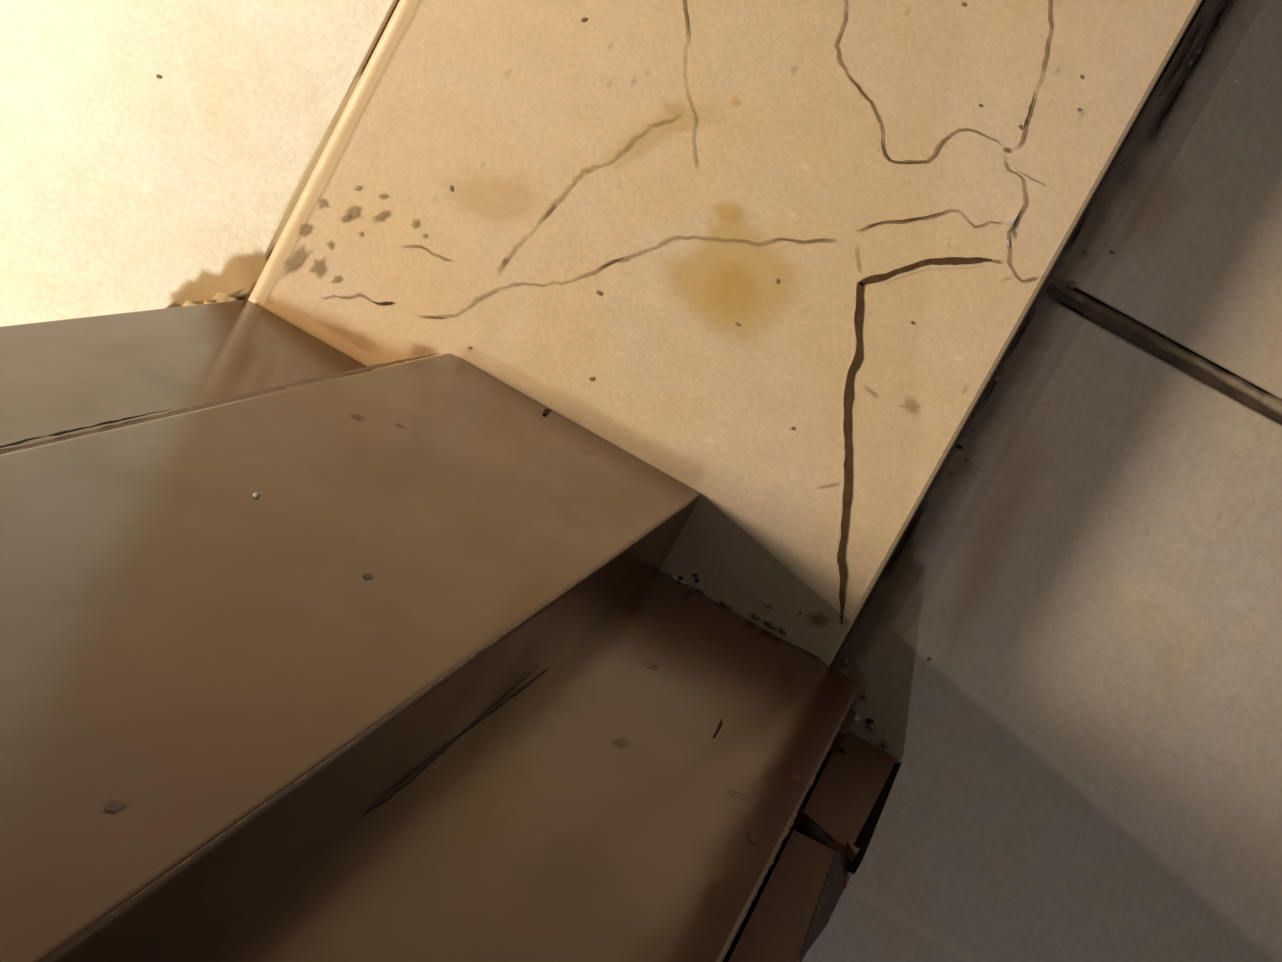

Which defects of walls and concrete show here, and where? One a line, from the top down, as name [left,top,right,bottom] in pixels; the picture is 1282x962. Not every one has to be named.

crack [326,294,393,305]
crack [408,245,449,261]
damp [685,229,775,322]
crack [423,0,1052,624]